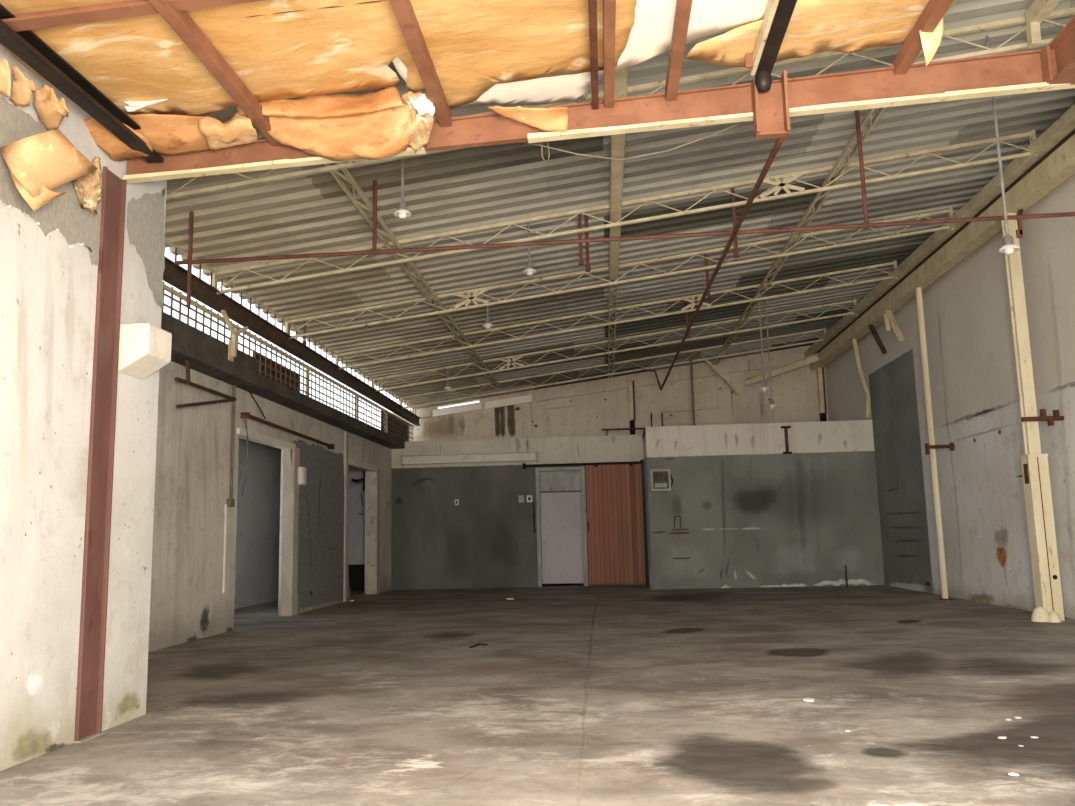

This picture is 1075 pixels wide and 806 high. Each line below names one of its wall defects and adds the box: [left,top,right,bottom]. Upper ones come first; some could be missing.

peeling [0,98,102,265]
peeling [127,188,166,309]
corrosion [997,547,1007,566]
damp [19,736,65,756]